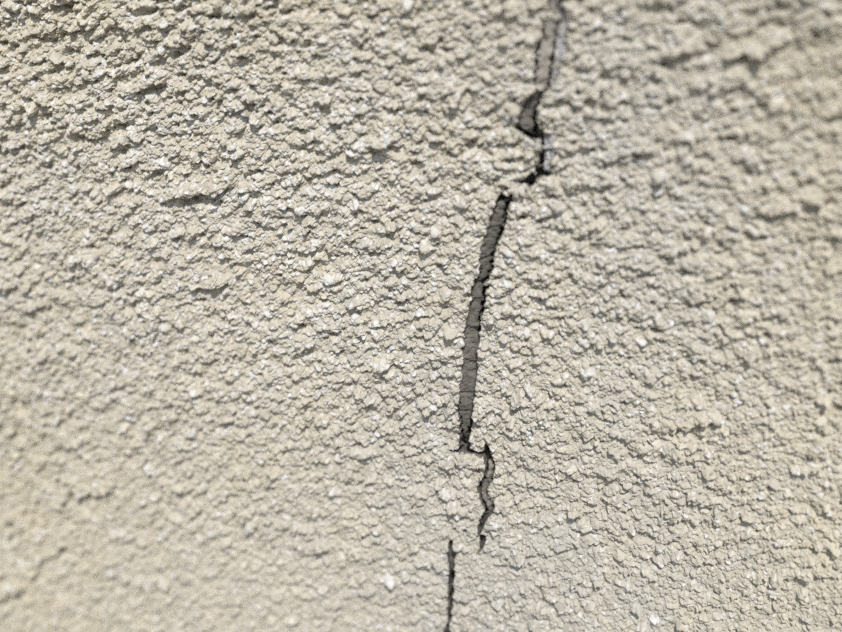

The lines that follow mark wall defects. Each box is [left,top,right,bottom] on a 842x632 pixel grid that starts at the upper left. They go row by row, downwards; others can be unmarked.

crack [443,0,572,632]